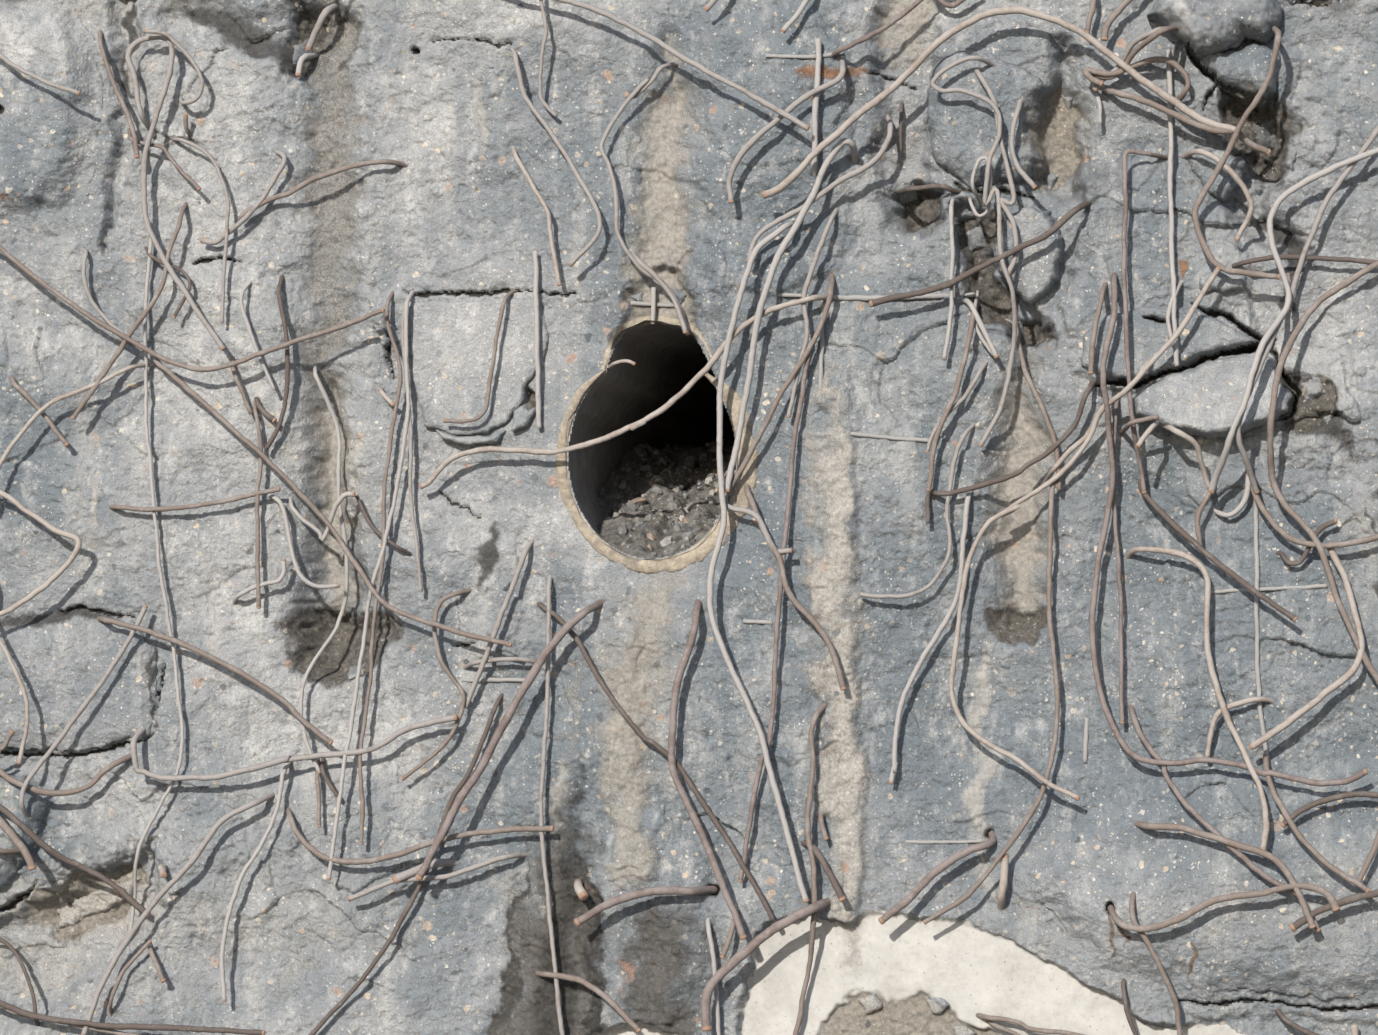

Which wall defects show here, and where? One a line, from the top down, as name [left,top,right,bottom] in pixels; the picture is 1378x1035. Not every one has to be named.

water stain [627,42,688,317]
crack [385,321,395,379]
crack [408,288,576,298]
crack [1094,307,1296,419]
crack [0,665,166,759]
crack [60,605,135,618]
water stain [601,577,682,889]
water stain [803,372,867,962]
water stain [487,775,607,1035]
water stain [624,907,696,1035]
peeling [736,910,1245,1035]